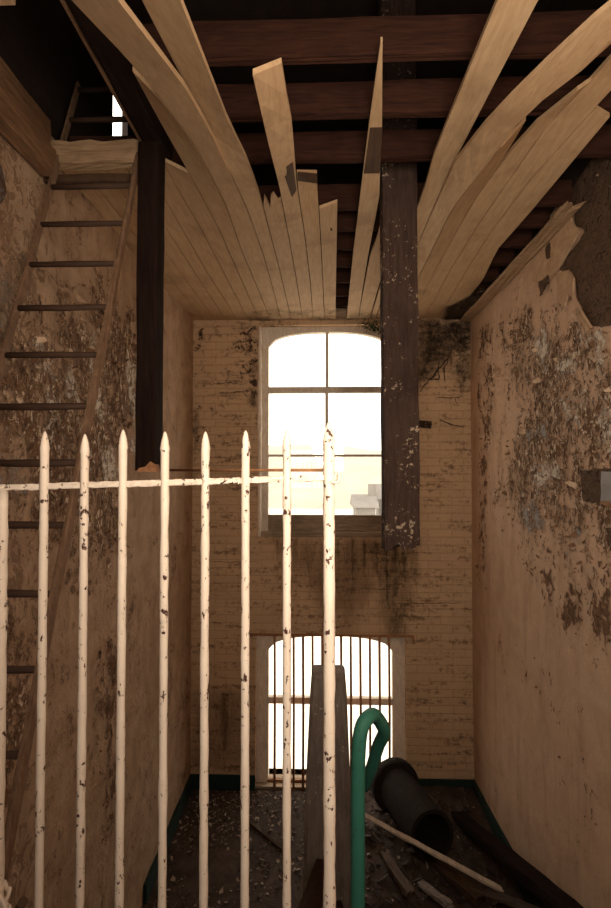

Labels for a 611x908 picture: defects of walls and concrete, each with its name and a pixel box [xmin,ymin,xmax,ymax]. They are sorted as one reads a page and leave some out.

peeling [0,268,137,612]
spalling [475,158,611,668]
peeling [5,600,37,796]
peeling [93,631,128,847]